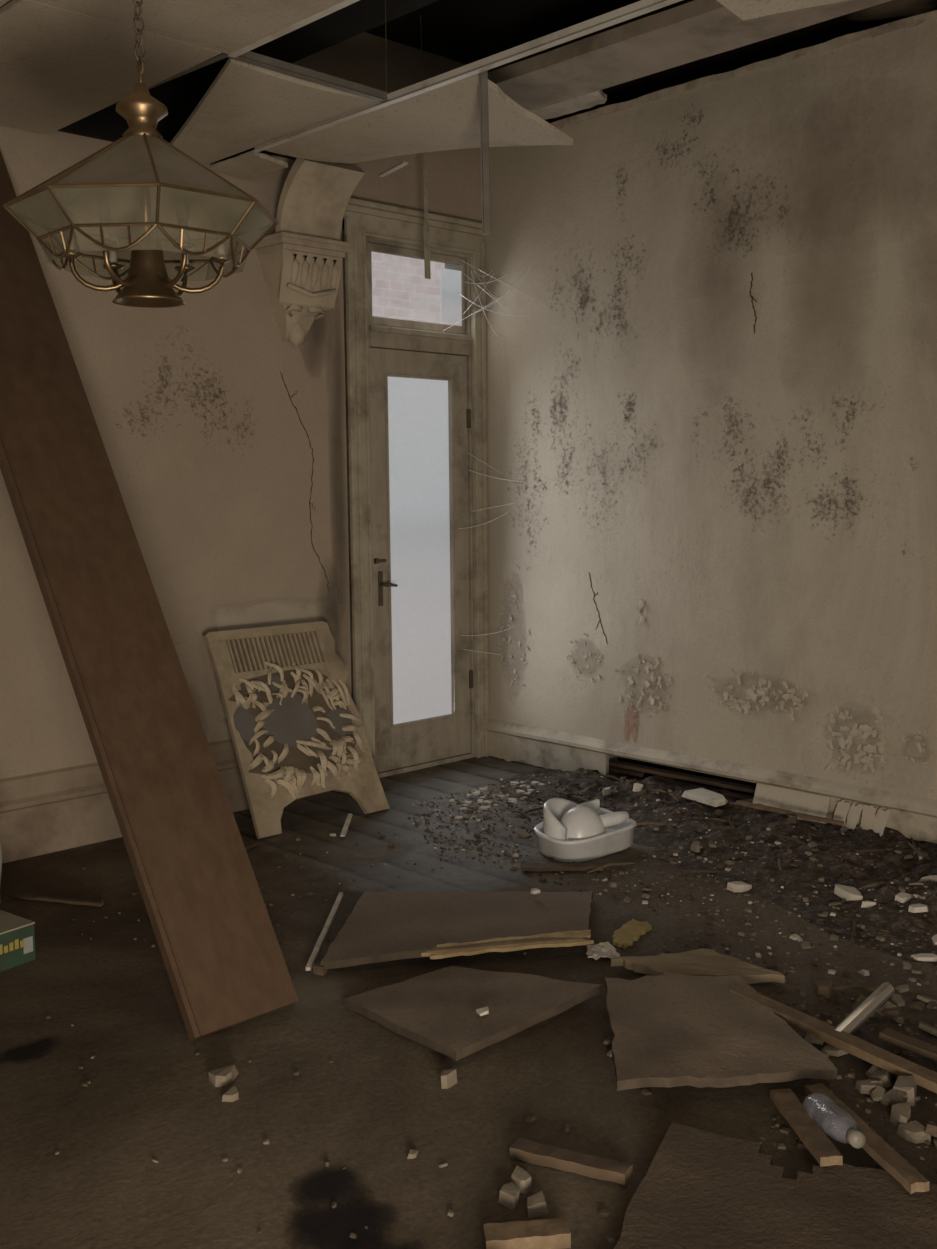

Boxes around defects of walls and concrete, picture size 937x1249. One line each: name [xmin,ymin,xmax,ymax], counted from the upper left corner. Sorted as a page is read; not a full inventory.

crack [749,273,757,334]
crack [280,372,330,593]
crack [589,573,607,642]
peeling [706,670,809,721]
peeling [817,705,892,780]